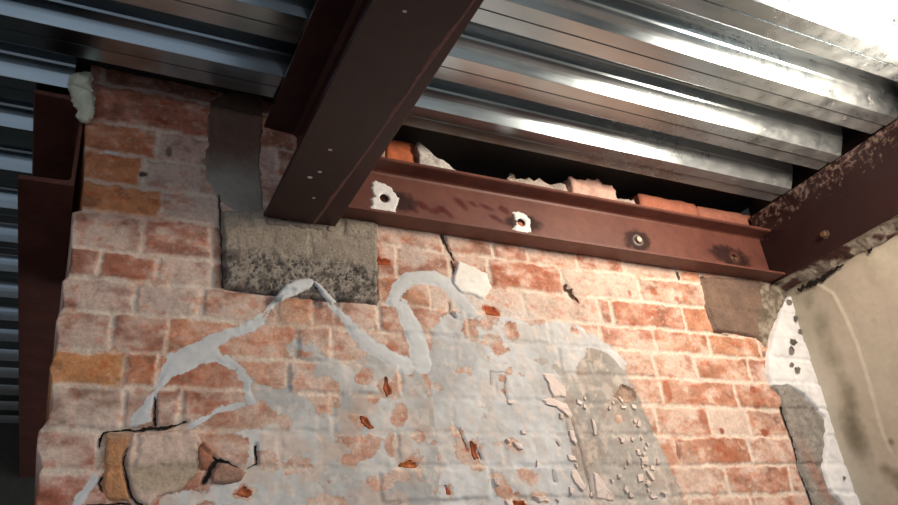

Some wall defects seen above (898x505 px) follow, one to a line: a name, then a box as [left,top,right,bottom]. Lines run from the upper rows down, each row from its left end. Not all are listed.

crack [441,235,455,274]
peeling [452,261,500,316]
spalling [789,315,802,373]
spalling [383,376,392,397]
peeling [542,373,583,419]
spalling [101,436,131,503]
crack [86,397,187,505]
spalling [198,442,253,498]
crack [202,445,258,485]
spalling [398,460,417,468]
peeling [567,384,667,502]
peeling [504,496,560,505]